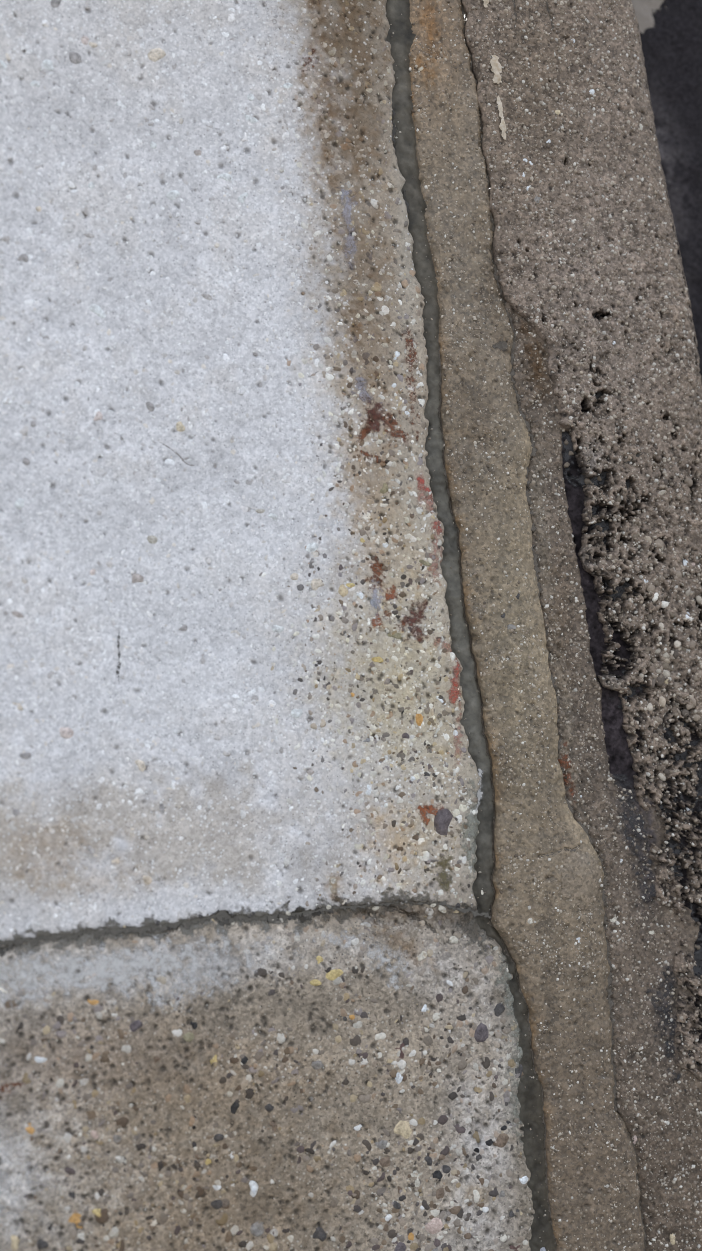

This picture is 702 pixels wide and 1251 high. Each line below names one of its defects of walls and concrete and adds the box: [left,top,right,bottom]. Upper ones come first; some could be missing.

spalling [561,431,610,550]
rust [365,556,427,642]
crack [461,0,647,1251]
spalling [605,581,637,605]
crack [0,291,557,1251]
rust [418,805,444,825]
spalling [658,719,702,877]
spalling [689,902,702,984]